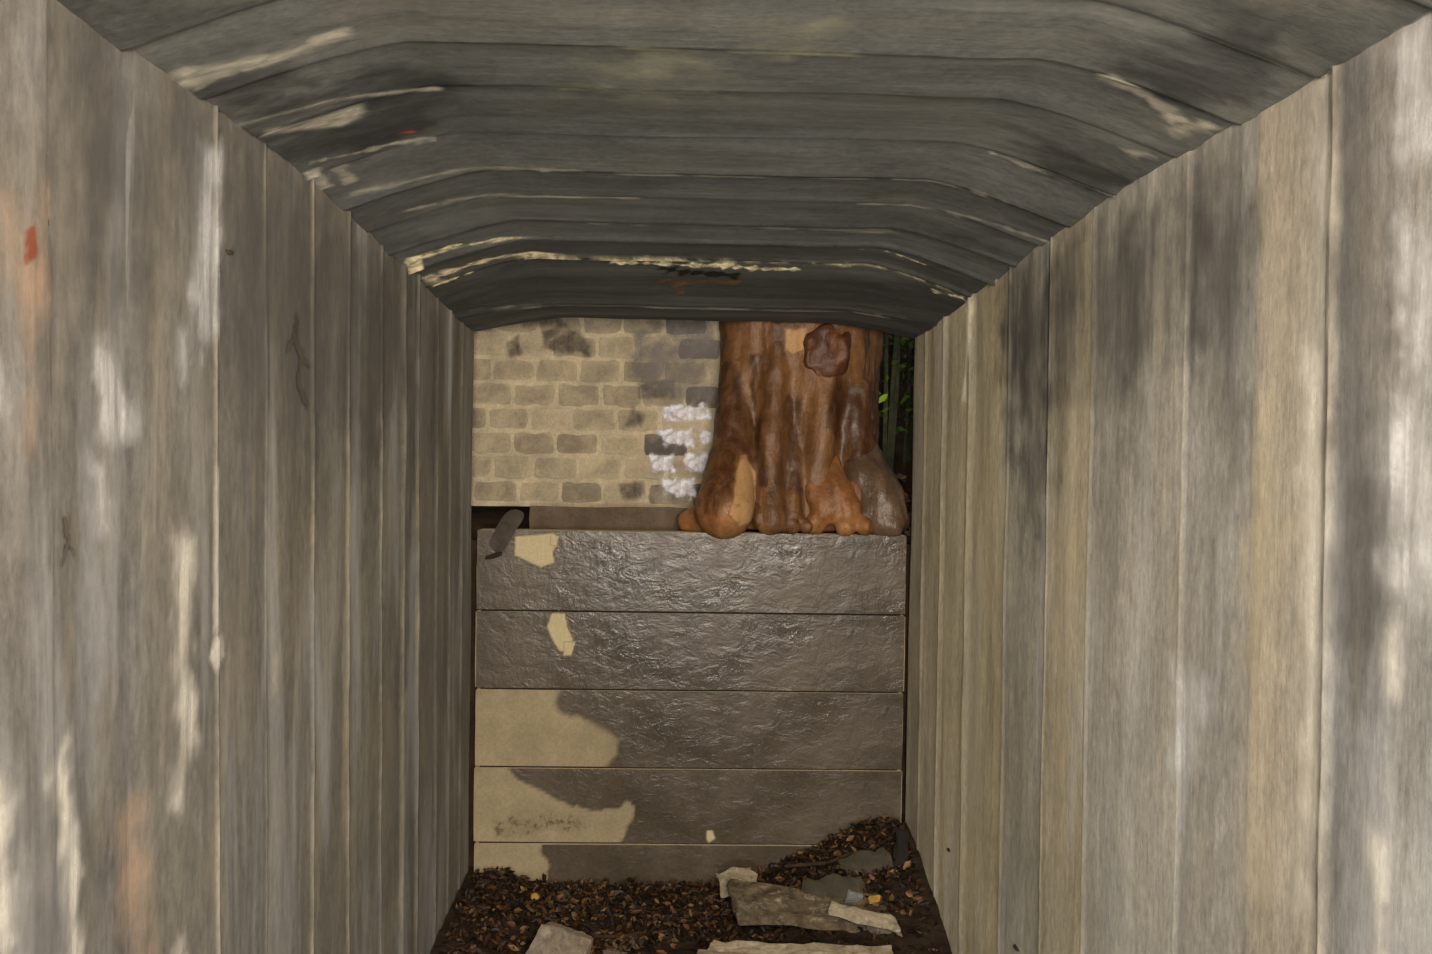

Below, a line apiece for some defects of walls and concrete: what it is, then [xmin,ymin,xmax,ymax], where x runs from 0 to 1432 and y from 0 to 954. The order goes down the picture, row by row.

spalling [407,237,569,286]
spalling [604,258,797,280]
peeling [515,533,559,567]
peeling [547,613,575,656]